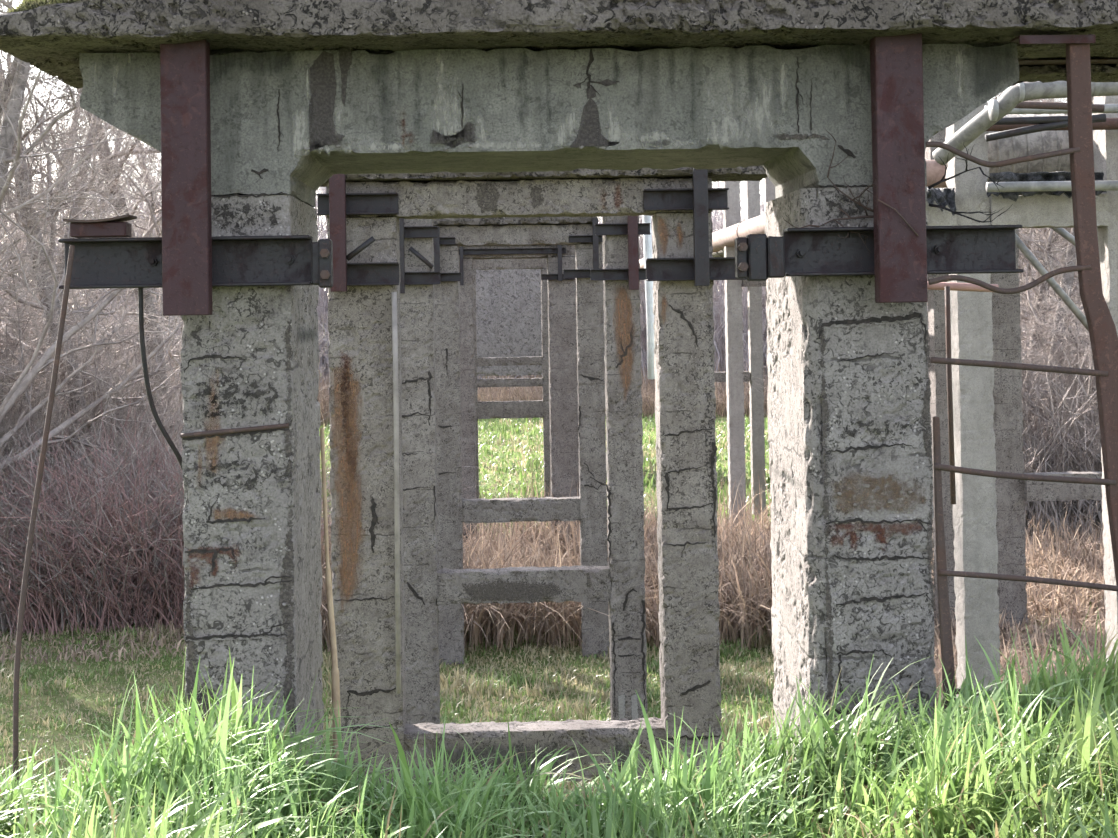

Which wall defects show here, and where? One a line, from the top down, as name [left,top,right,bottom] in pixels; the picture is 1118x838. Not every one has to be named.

crack [579,48,619,95]
crack [795,57,812,133]
water stain [293,111,330,153]
water stain [345,142,402,151]
crack [838,145,856,158]
crack [822,184,868,203]
corrosion [615,288,633,397]
crack [669,304,698,347]
corrosion [333,355,361,606]
corrosion [829,522,922,549]